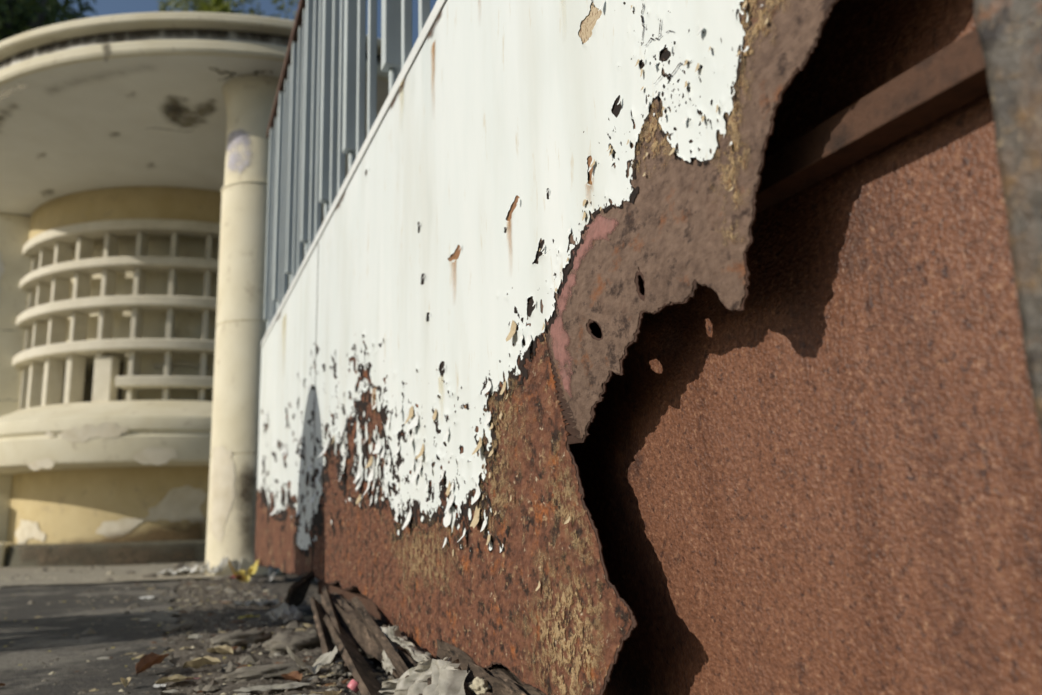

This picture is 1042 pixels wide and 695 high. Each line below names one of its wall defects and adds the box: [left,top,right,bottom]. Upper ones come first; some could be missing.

peeling [578,0,604,44]
peeling [660,45,674,61]
leakage [164,98,215,127]
peeling [612,95,622,118]
peeling [504,195,520,233]
peeling [448,245,461,261]
peeling [527,296,536,317]
corrosion [254,0,834,695]
peeling [96,444,236,543]
peeling [15,519,45,544]